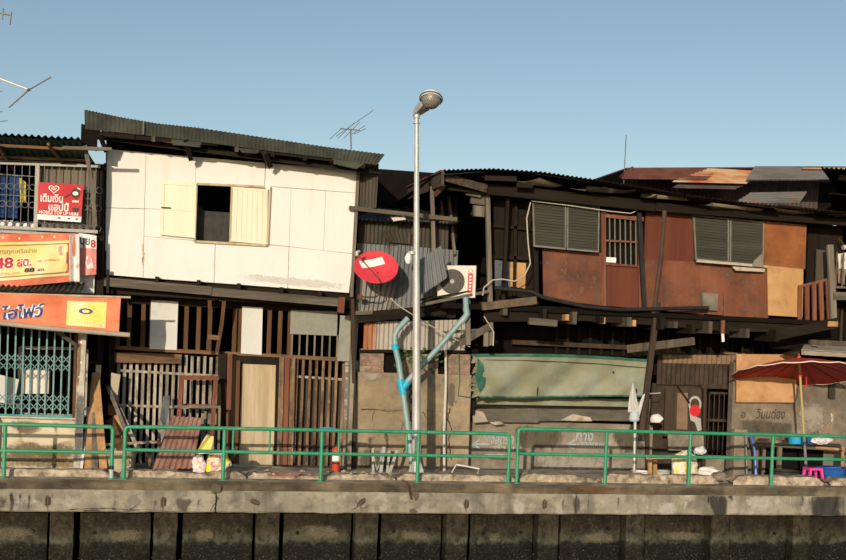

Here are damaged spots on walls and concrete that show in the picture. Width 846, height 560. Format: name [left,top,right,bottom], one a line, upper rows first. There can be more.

damp [0,527,32,541]
damp [106,530,144,542]
damp [186,529,224,541]
damp [302,526,339,539]
damp [398,531,432,541]
damp [582,533,614,544]
damp [663,532,697,542]